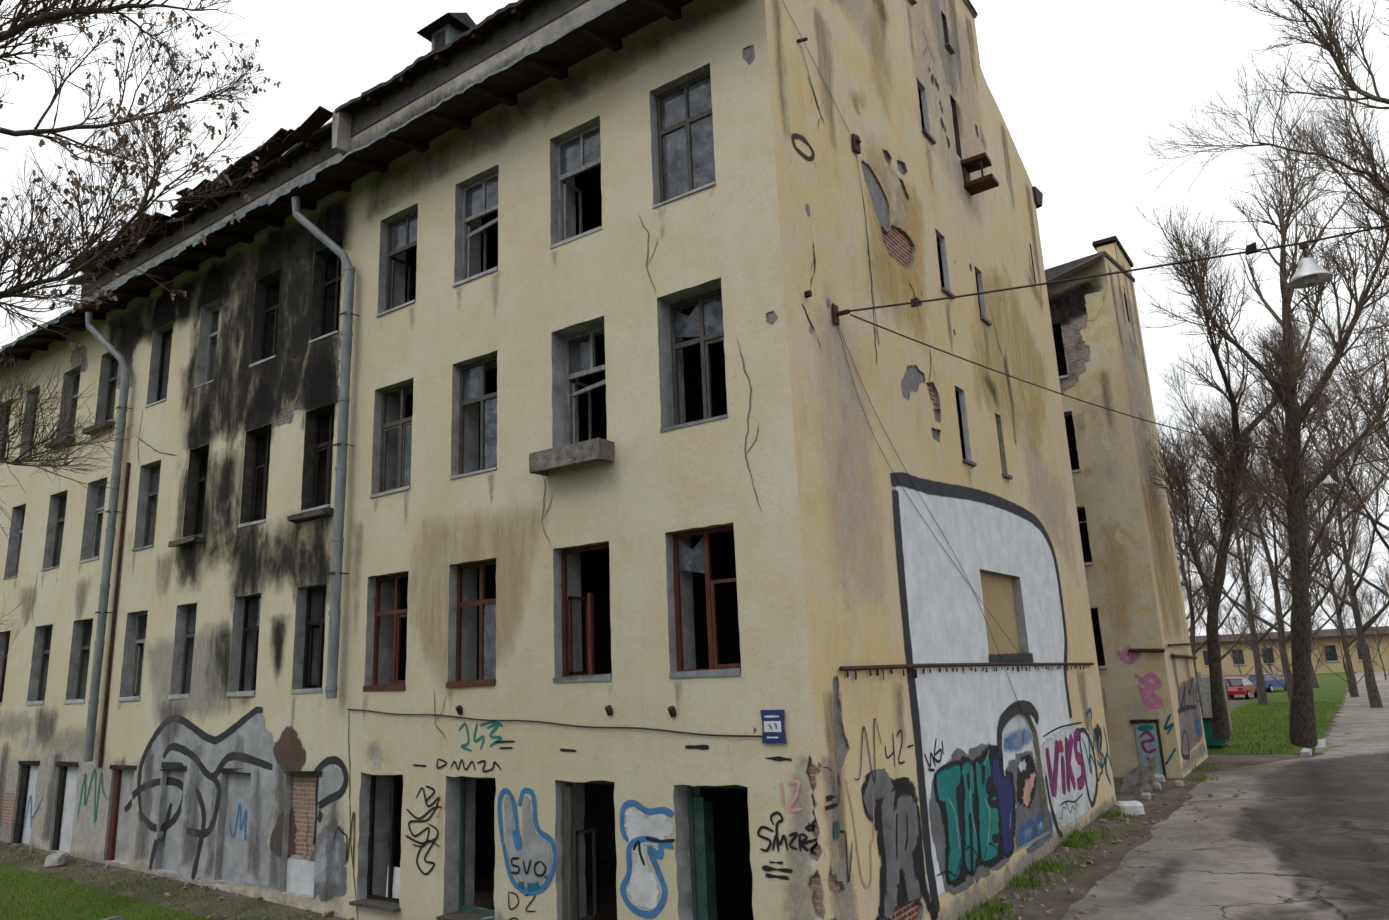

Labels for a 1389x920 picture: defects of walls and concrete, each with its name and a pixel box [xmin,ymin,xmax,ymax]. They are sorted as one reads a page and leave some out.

water stain [920,0,973,191]
crack [639,216,658,294]
spalling [861,149,916,269]
spalling [1048,281,1104,394]
crack [736,338,762,512]
spalling [901,364,941,443]
peeling [0,741,179,881]
spalling [265,789,332,868]
peeling [788,674,855,920]
peeling [875,799,1114,920]